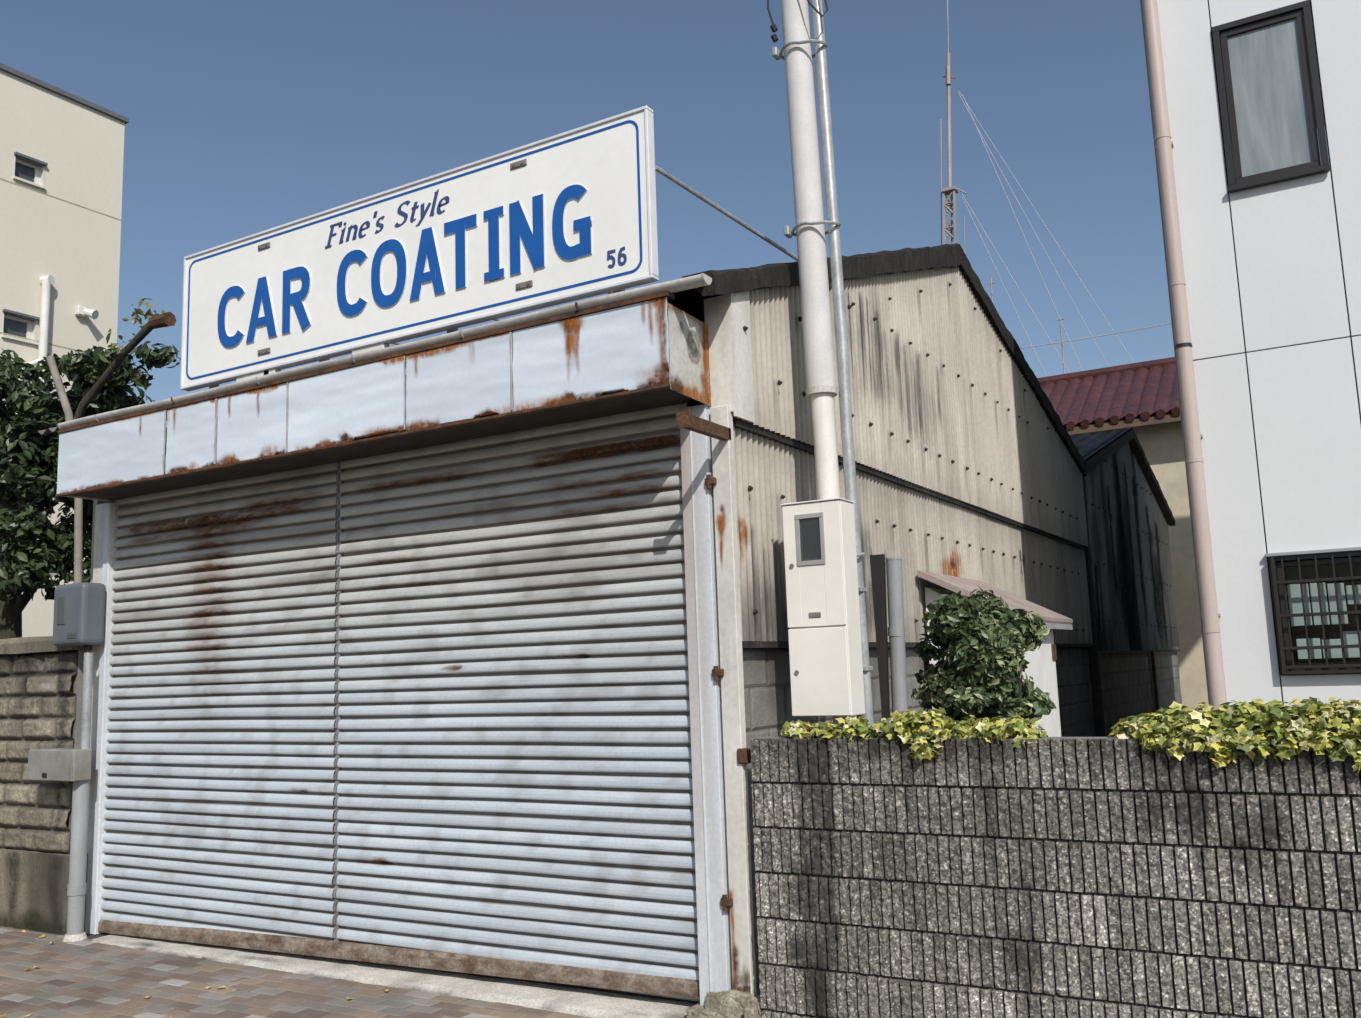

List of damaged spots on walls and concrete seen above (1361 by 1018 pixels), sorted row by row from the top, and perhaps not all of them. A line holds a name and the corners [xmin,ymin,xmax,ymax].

corrosion [379,333,504,370]
corrosion [561,317,581,354]
corrosion [641,297,711,406]
water stain [848,294,880,376]
corrosion [122,385,278,431]
corrosion [517,392,606,411]
corrosion [168,455,240,473]
corrosion [306,423,439,449]
corrosion [535,435,677,467]
corrosion [131,497,303,650]
corrosion [717,507,747,559]
water stain [1107,469,1167,639]